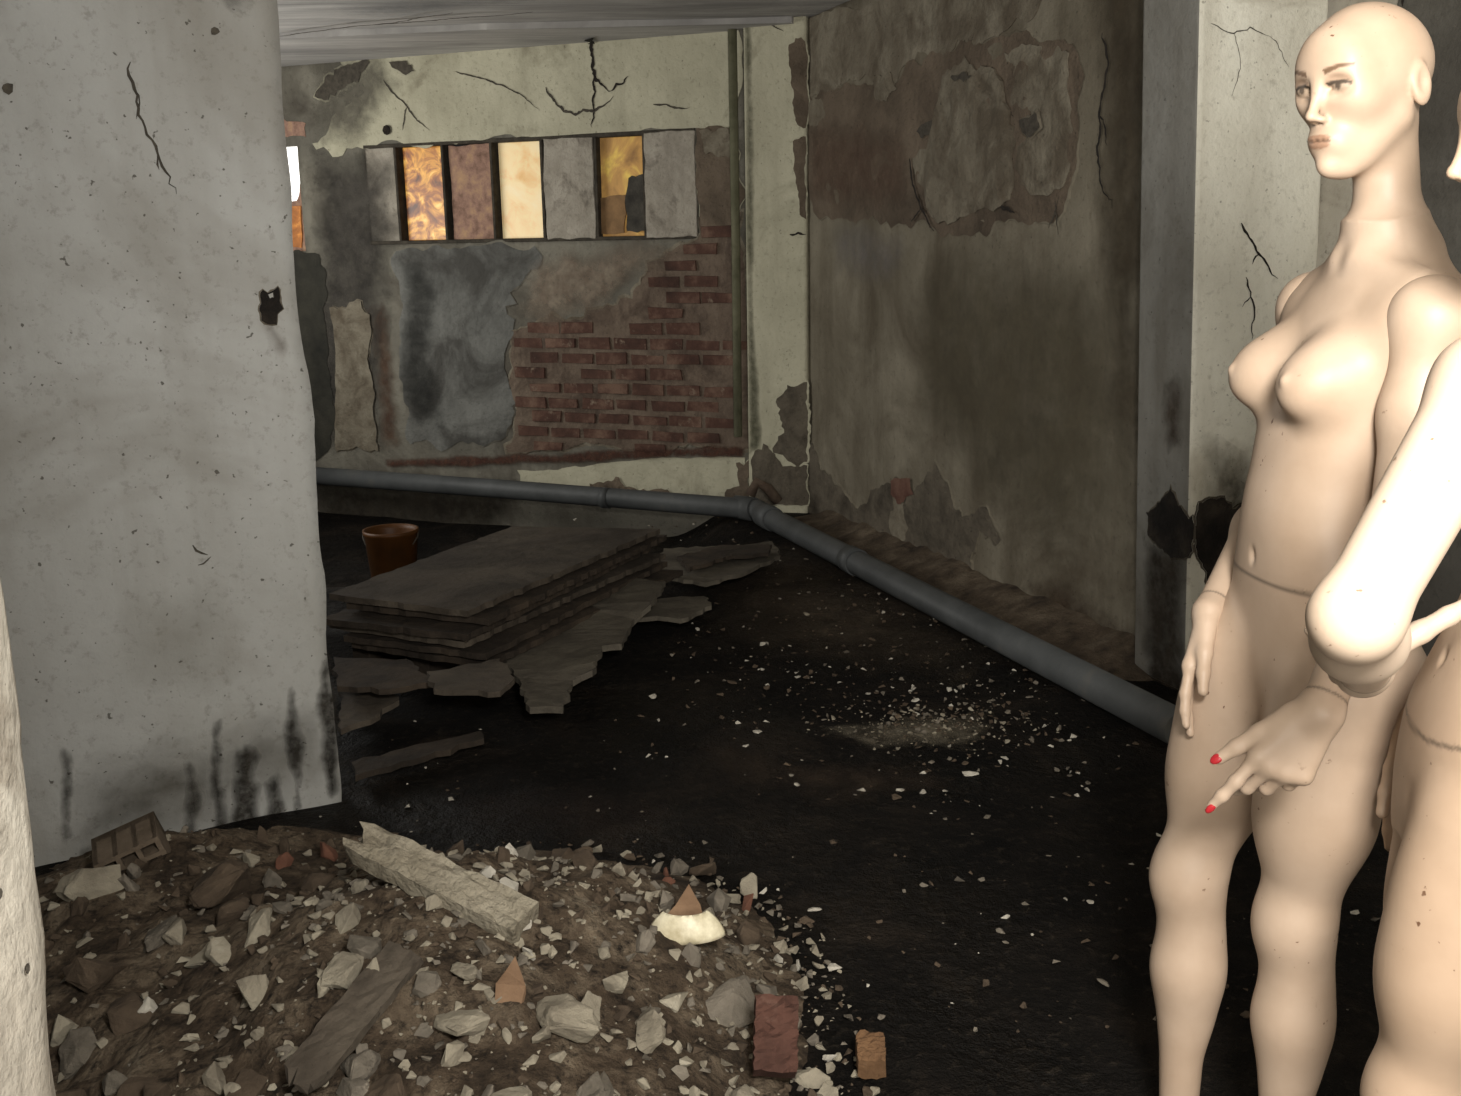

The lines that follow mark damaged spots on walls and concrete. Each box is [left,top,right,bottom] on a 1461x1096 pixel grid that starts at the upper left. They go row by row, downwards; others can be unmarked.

crack [127,62,177,194]
crack [457,44,628,127]
crack [1211,23,1289,95]
flaking render [1397,0,1461,274]
flaking render [258,250,335,461]
damp [405,272,431,416]
flaking render [312,30,1002,570]
crack [1241,223,1277,338]
flaking render [1411,529,1461,622]
damp [141,750,283,833]
damp [287,712,303,769]
damp [320,667,337,793]